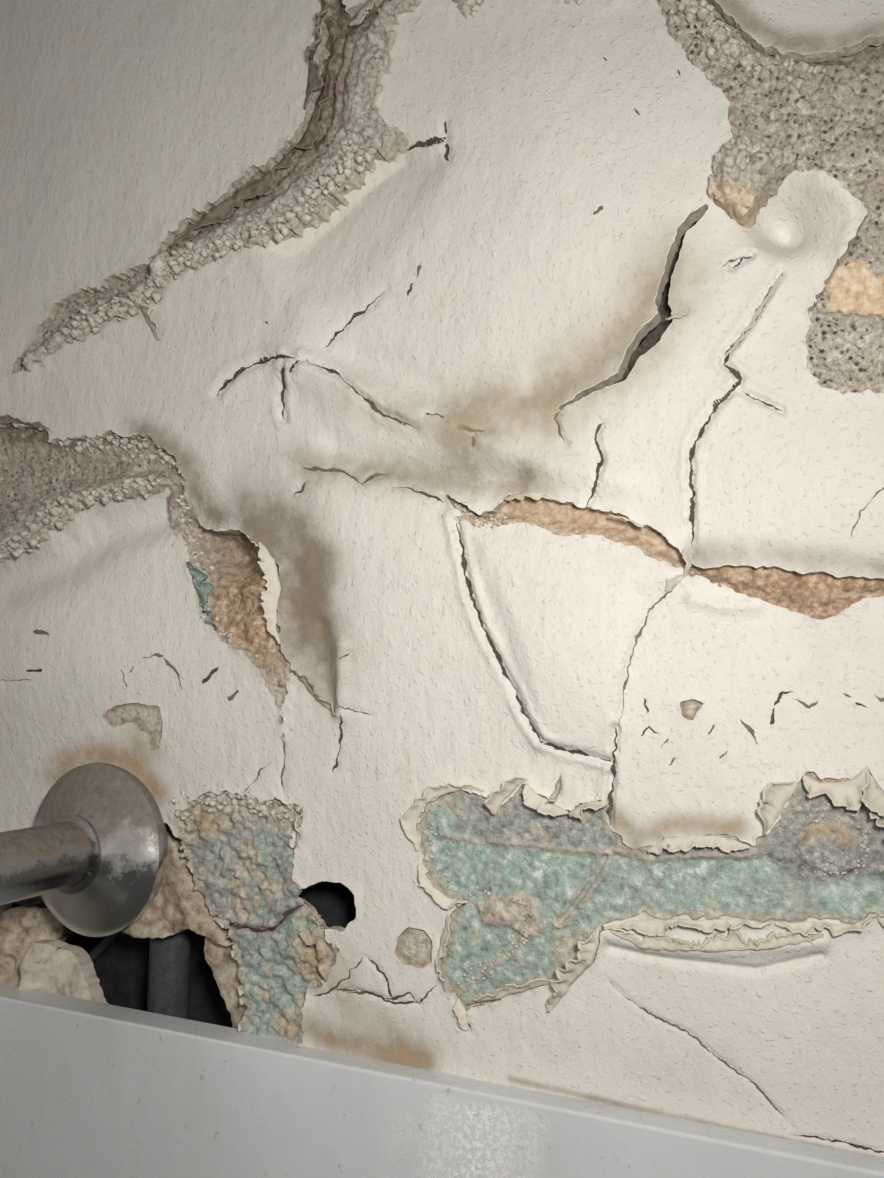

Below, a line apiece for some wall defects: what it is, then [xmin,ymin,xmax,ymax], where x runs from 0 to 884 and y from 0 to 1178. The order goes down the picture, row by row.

flaking render [19,0,423,372]
crack [217,265,485,447]
crack [407,121,450,161]
crack [614,224,695,384]
flaking render [654,0,884,395]
flaking render [0,415,335,717]
damp [241,505,335,682]
crack [294,272,884,825]
peeling [0,784,356,1044]
crack [314,957,436,1005]
peeling [397,766,884,1031]
crack [609,981,884,1153]